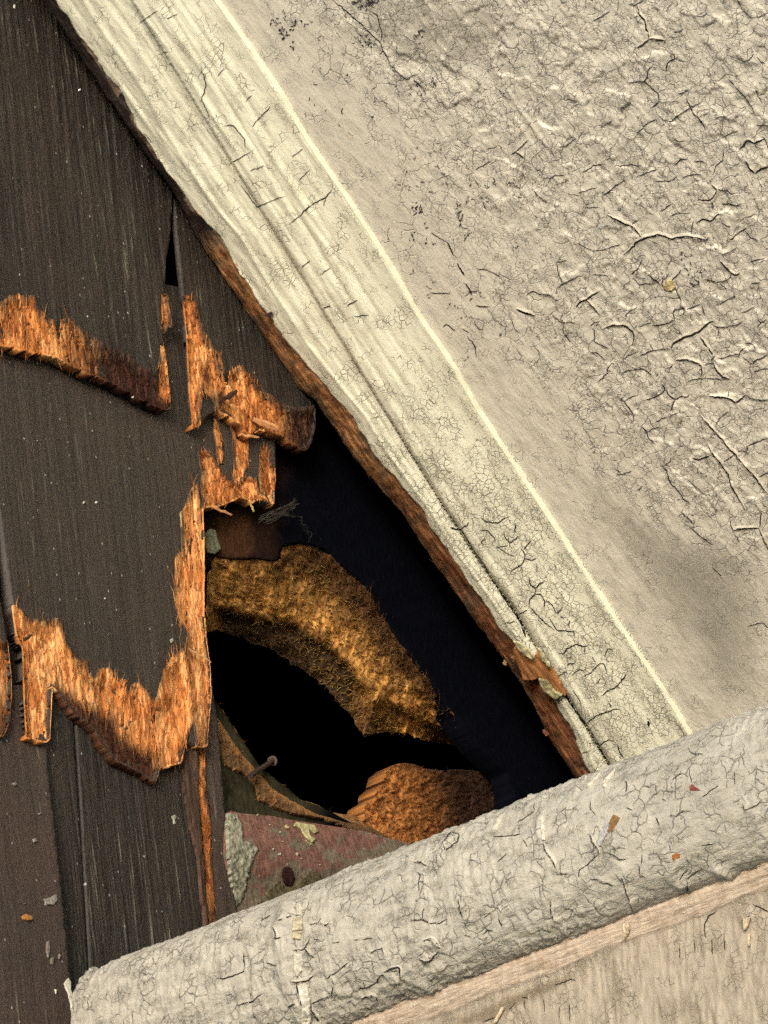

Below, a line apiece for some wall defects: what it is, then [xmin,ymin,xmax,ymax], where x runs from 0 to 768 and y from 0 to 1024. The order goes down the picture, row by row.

crack [334,1,422,88]
crack [200,67,331,225]
crack [431,216,500,356]
crack [511,0,768,576]
peeling [512,640,567,700]
crack [480,516,632,810]
peeling [225,813,259,907]
peeling [285,822,319,846]
crack [493,802,643,912]
crack [656,748,760,824]
crack [219,832,502,1023]
crack [679,911,725,958]